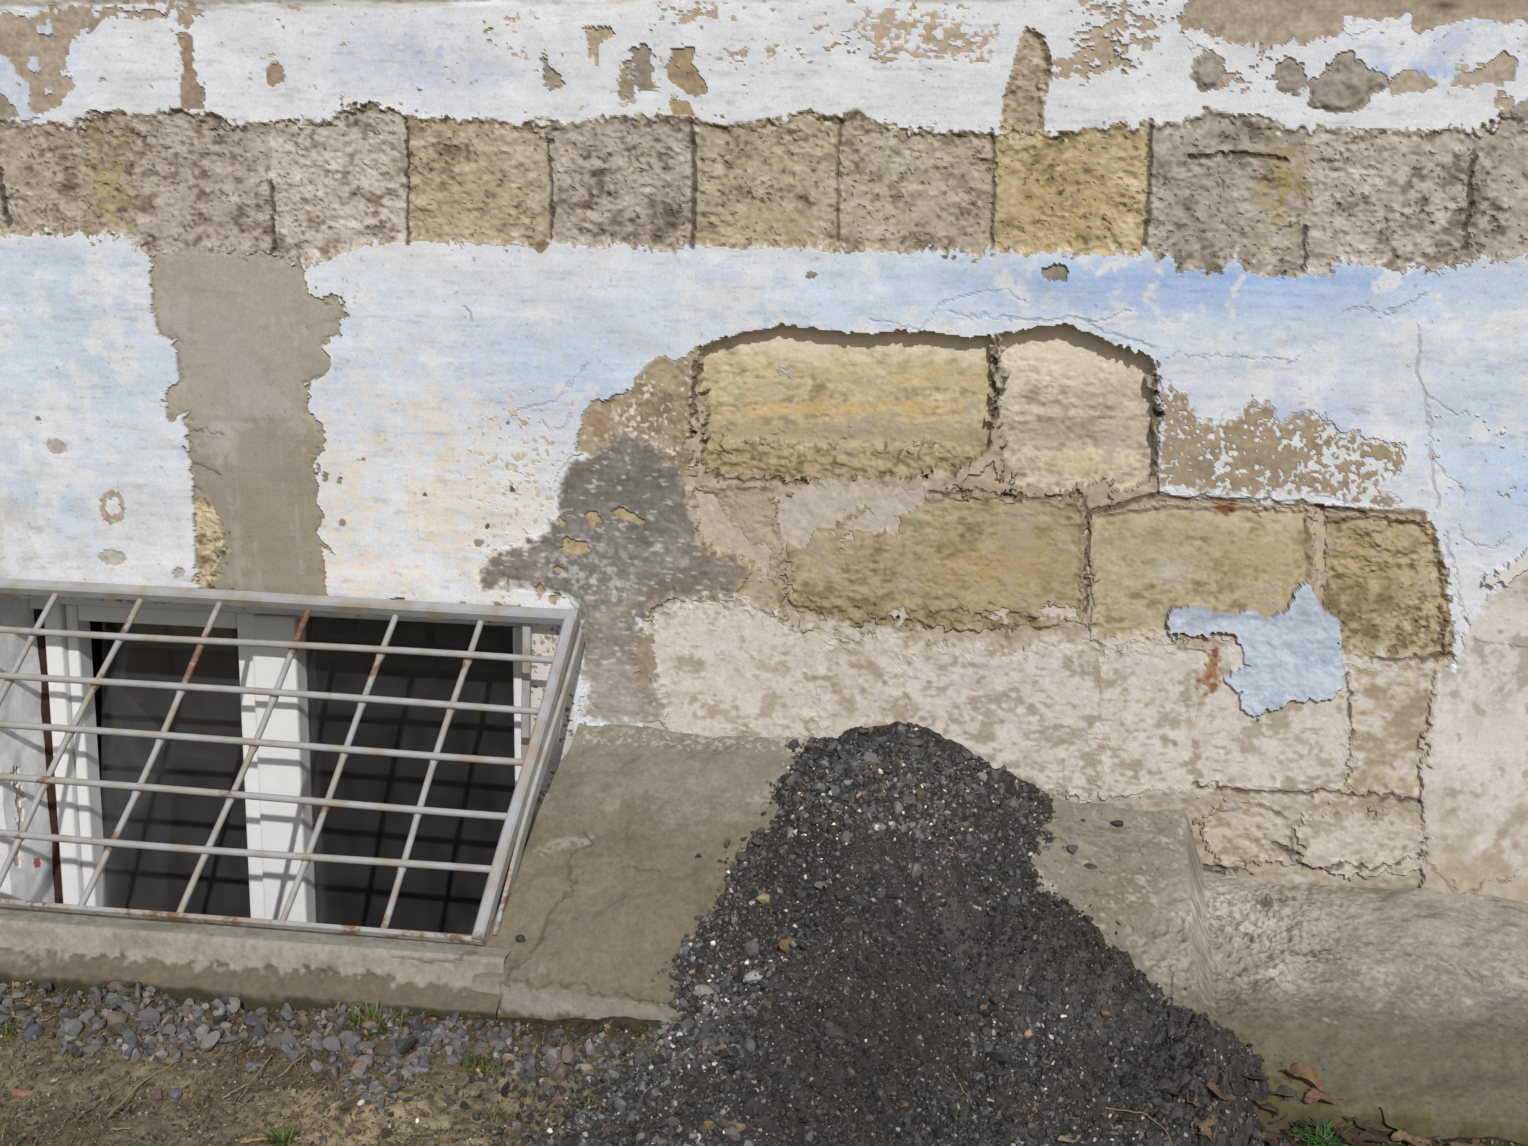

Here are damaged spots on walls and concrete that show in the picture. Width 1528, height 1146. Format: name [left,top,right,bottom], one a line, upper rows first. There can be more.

spalling [0,0,1528,282]
spalling [172,498,231,590]
flaking render [316,462,343,485]
peeling [466,389,554,554]
spalling [570,322,1457,889]
crack [1192,294,1528,804]
crack [391,830,660,1011]
crack [1203,840,1518,907]